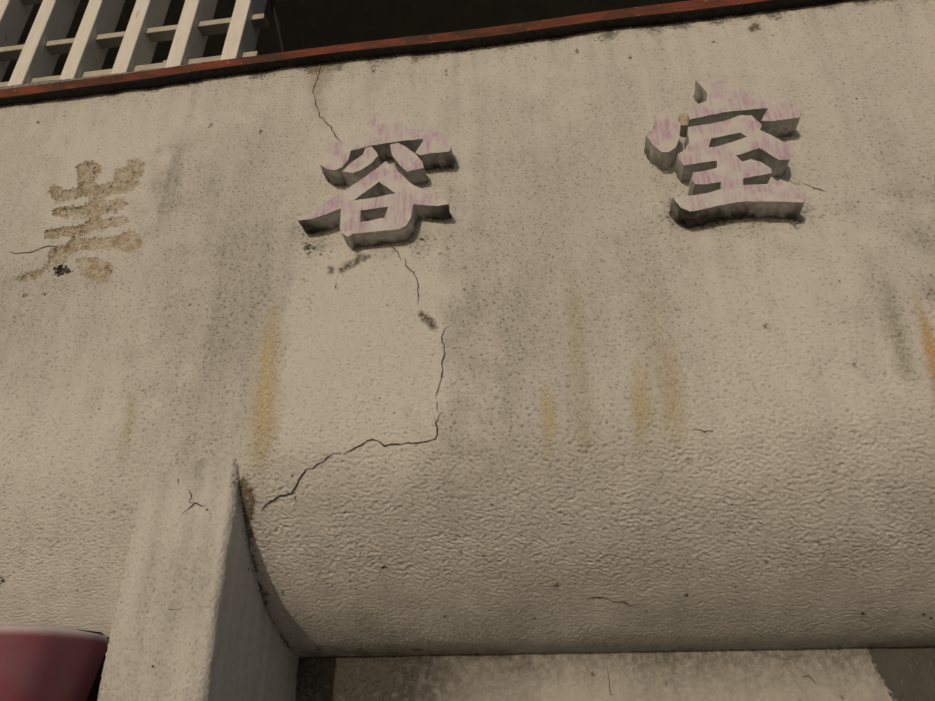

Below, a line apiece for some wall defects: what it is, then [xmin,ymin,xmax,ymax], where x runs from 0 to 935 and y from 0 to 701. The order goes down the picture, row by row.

crack [312,63,341,141]
crack [261,244,449,511]